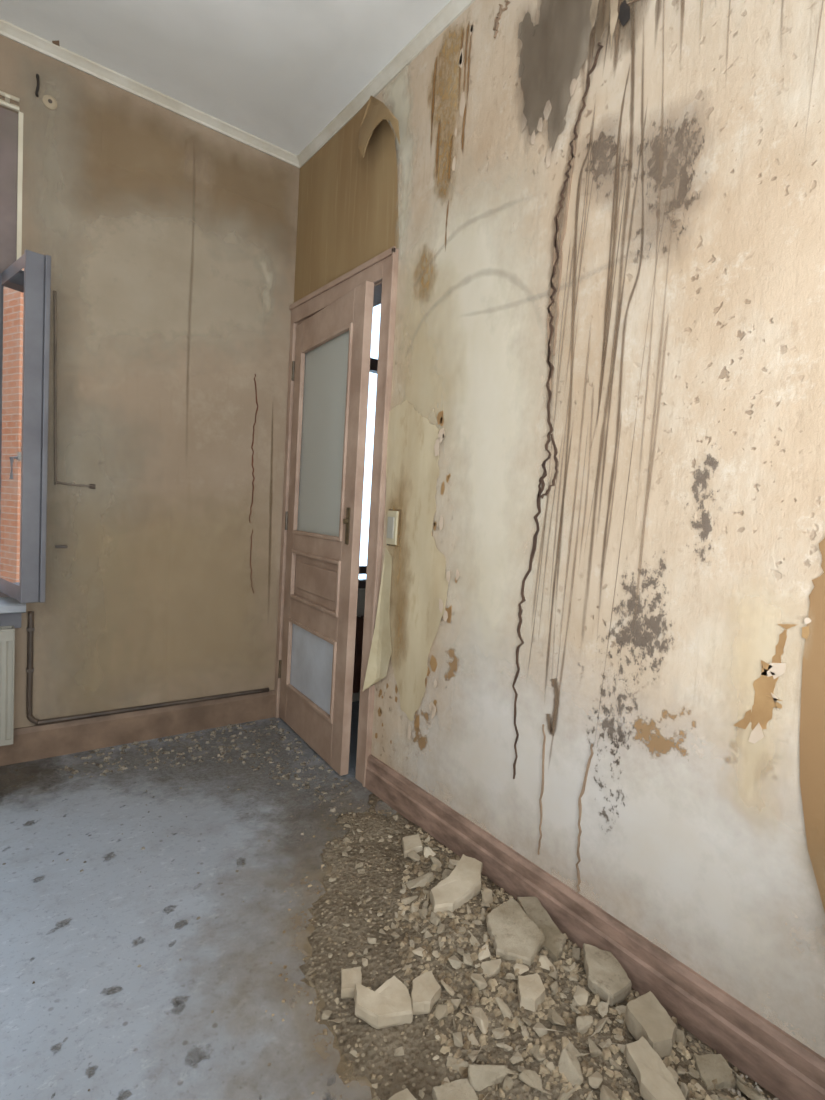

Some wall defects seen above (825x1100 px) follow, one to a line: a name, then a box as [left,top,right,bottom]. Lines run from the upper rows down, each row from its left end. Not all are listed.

leakage [413,0,804,990]
peeling [734,618,811,744]